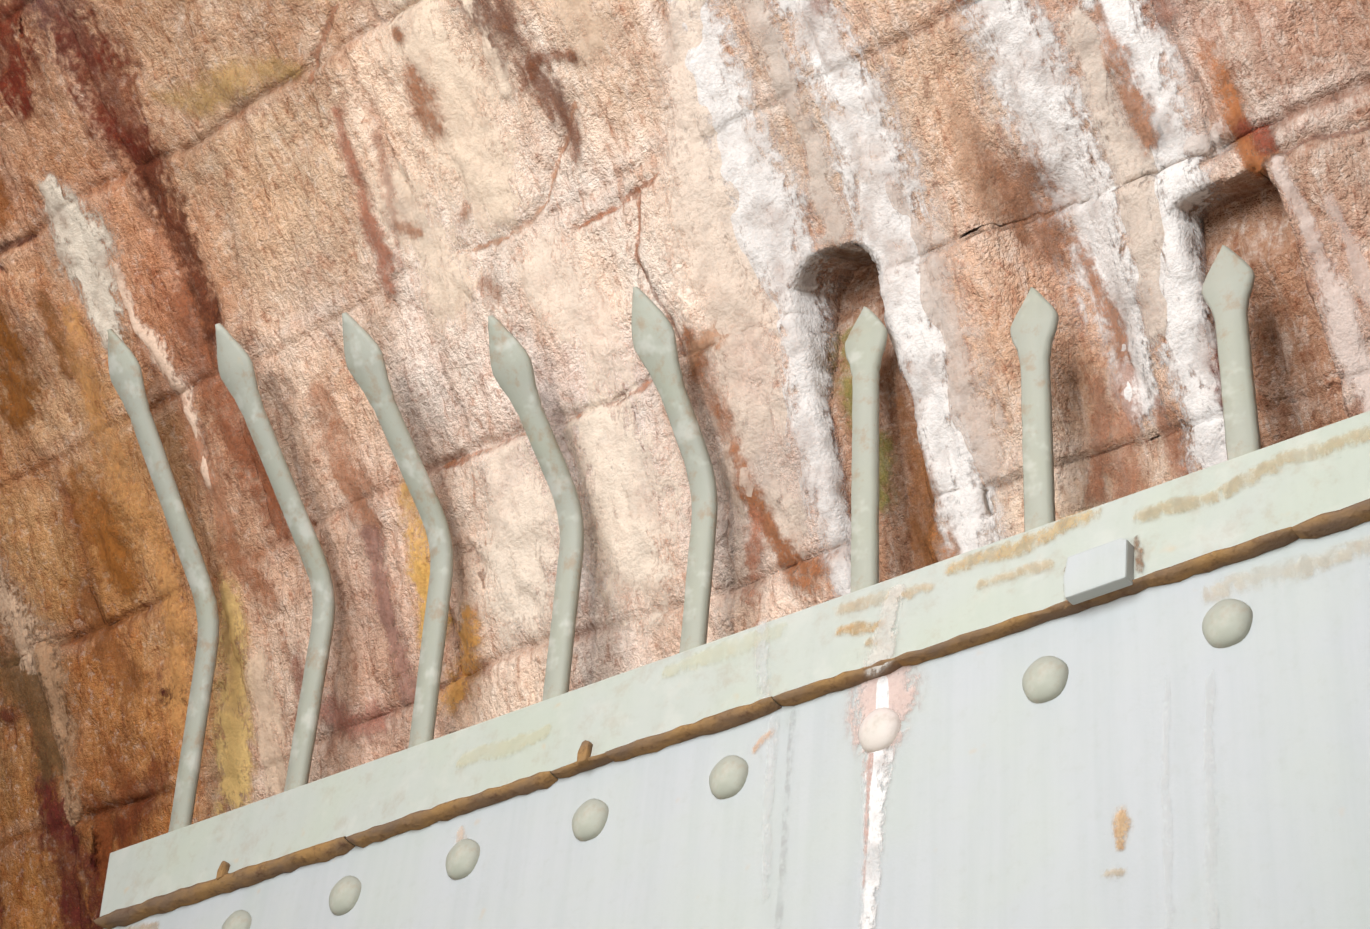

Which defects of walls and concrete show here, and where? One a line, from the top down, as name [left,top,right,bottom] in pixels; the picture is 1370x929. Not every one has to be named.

crack [0,234,37,272]
leakage [657,0,1011,596]
leakage [959,0,1293,474]
crack [1285,124,1370,154]
leakage [1295,206,1370,412]
rust [313,385,417,737]
rust [34,498,1370,929]
leakage [848,585,920,929]